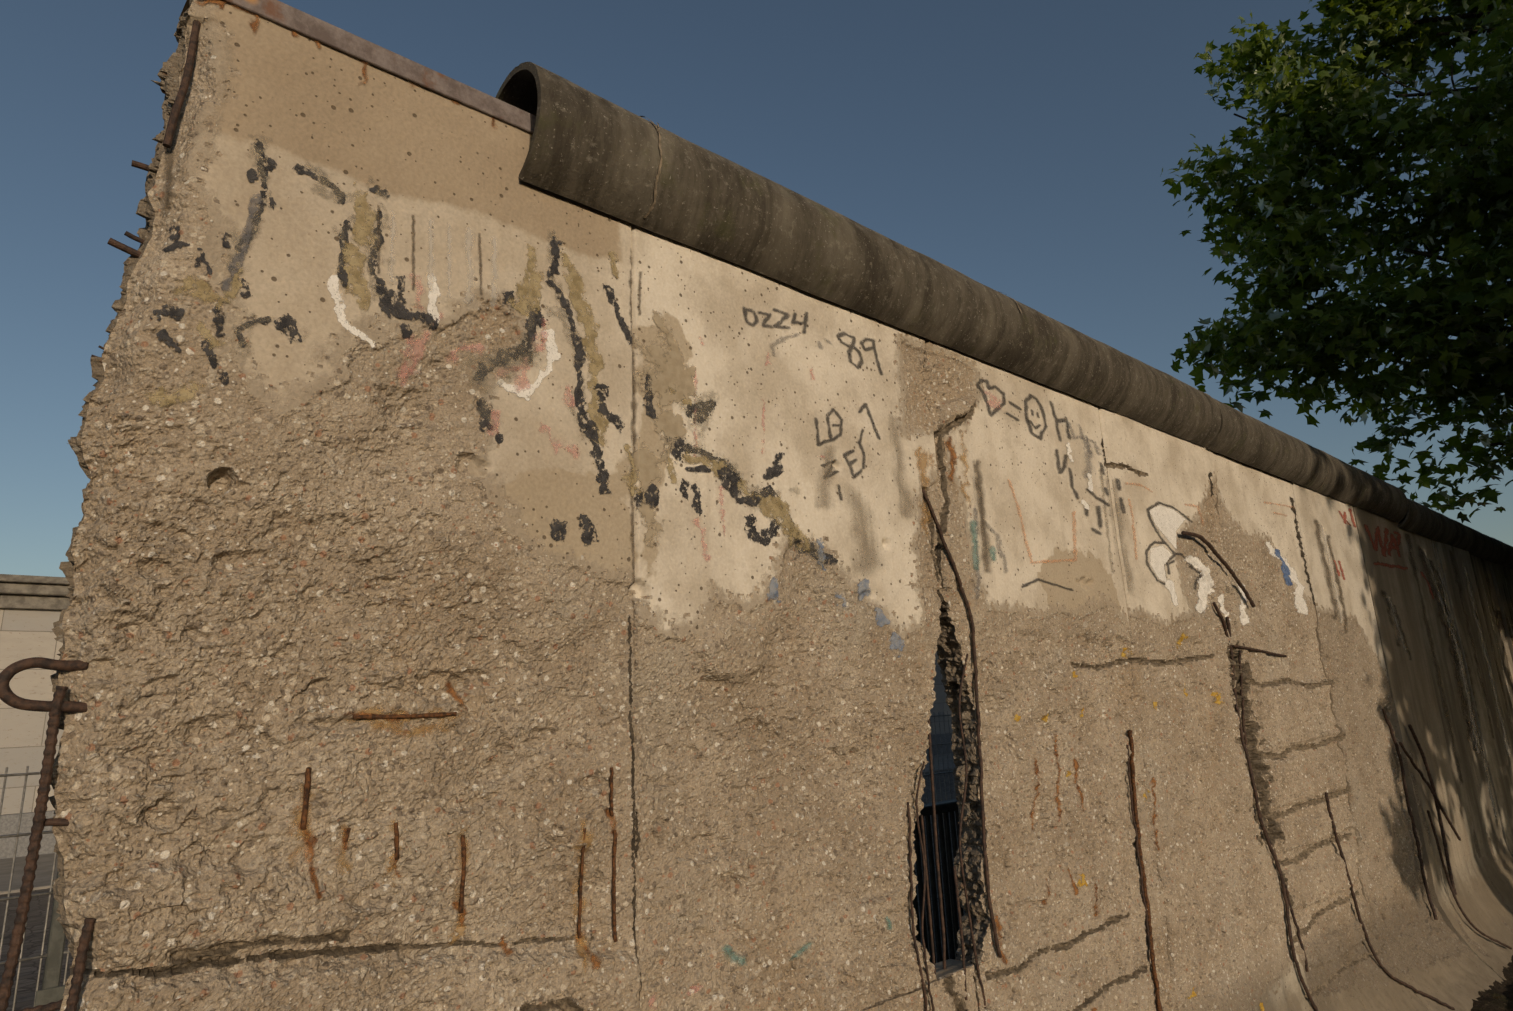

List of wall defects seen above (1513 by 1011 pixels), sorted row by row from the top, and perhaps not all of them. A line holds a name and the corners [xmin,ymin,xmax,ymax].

rust [198,0,259,31]
spalling [0,0,1002,1011]
crack [921,396,977,582]
rust [446,681,464,704]
spalling [934,436,1512,1011]
rust [296,807,322,899]
crack [627,616,642,1000]
rust [1151,777,1160,850]
crack [70,930,595,980]
crack [520,996,584,1011]
crack [942,912,1130,1011]
crack [1066,964,1148,1011]